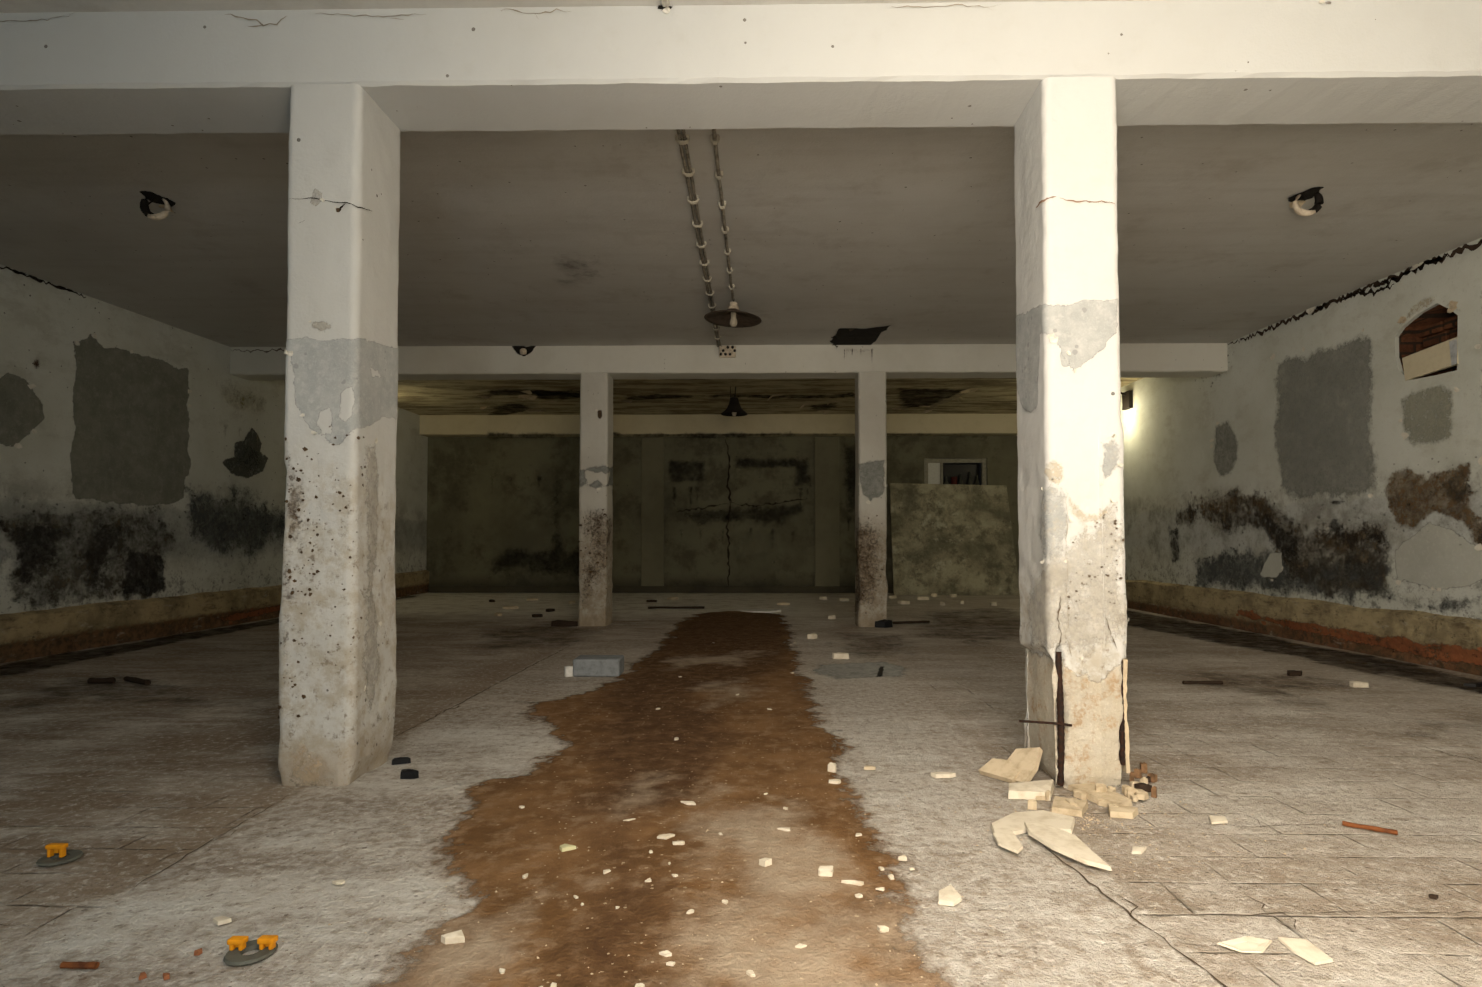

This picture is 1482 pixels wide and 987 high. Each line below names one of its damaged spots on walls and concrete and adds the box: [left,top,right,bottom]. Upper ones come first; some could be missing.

crack [299,197,371,223]
damp [0,428,285,609]
peeling [219,320,399,658]
damp [669,458,811,539]
crack [677,440,807,586]
damp [845,448,855,524]
peeling [1016,299,1118,413]
peeling [1270,328,1375,498]
damp [1170,457,1482,607]
crack [1228,239,1482,345]
peeling [1397,300,1460,445]
spalling [1019,434,1130,789]